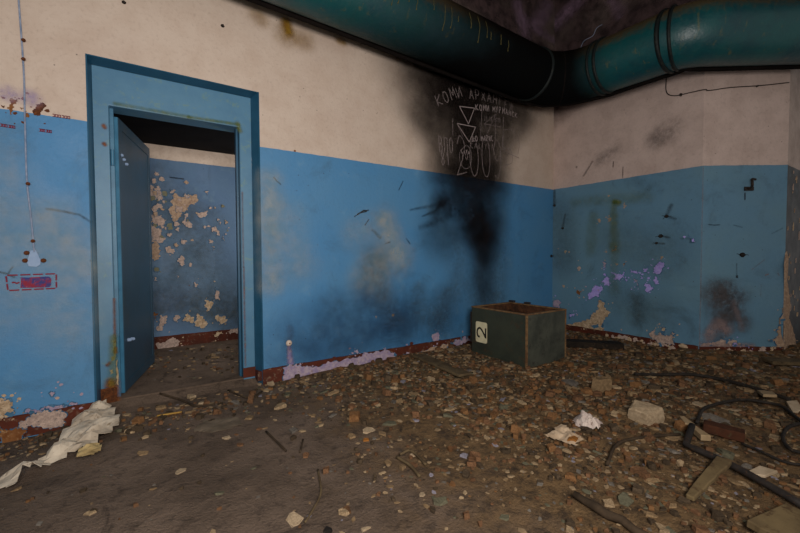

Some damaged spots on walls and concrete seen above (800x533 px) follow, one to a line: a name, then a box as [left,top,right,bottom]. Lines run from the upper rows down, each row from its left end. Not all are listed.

peeling [150,172,229,281]
peeling [153,281,238,349]
peeling [282,342,413,381]
peeling [421,331,470,352]
peeling [552,246,688,350]
flaking render [700,251,800,351]
flaking render [0,381,84,443]